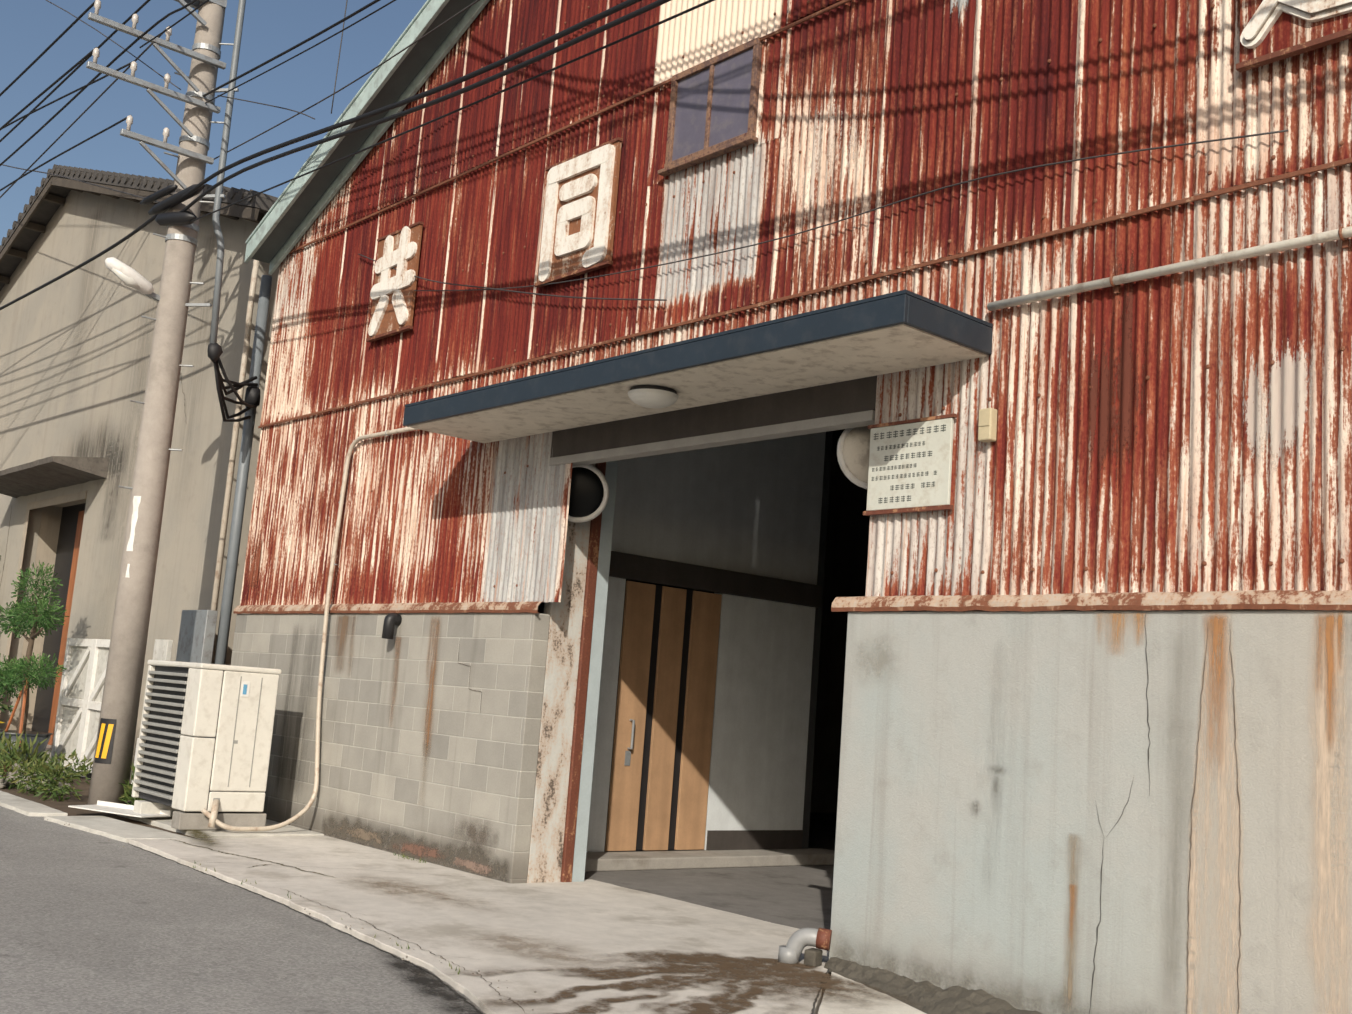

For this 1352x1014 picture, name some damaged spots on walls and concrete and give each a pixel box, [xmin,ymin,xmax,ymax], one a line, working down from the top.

rust [1079,249,1146,494]
rust [246,532,262,589]
crack [1089,615,1150,1013]
rust [1188,615,1239,1014]
rust [1314,614,1345,971]
damp [390,956,480,1014]
damp [486,951,877,1014]